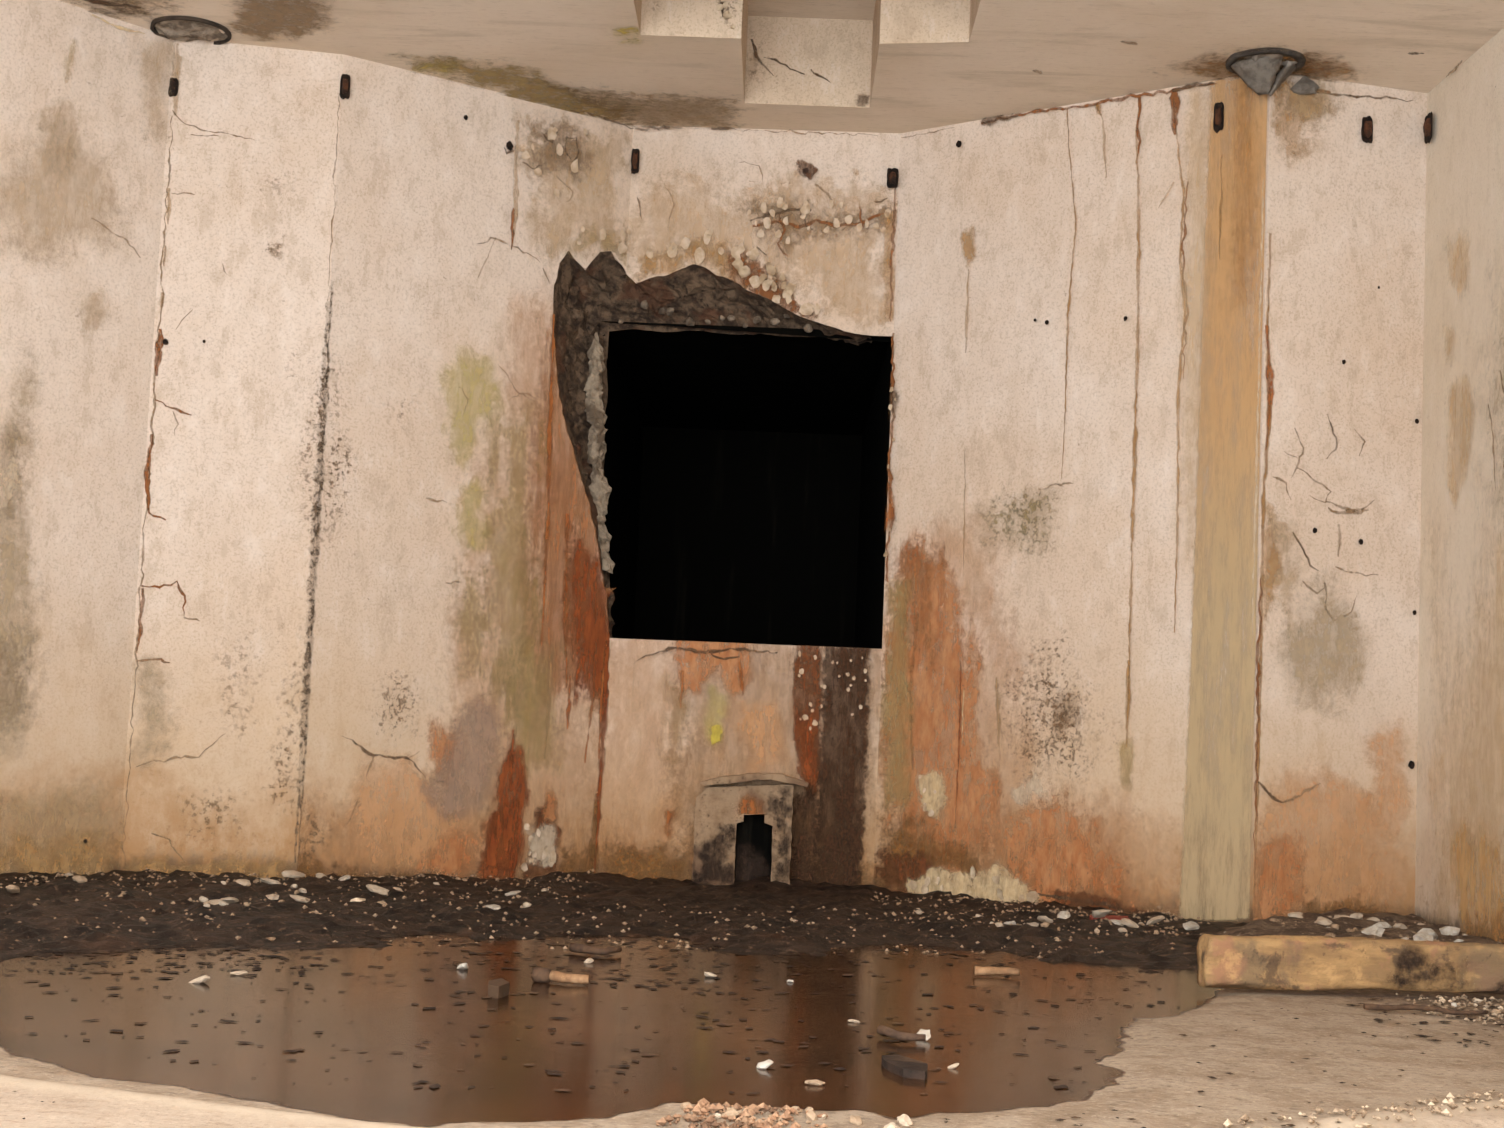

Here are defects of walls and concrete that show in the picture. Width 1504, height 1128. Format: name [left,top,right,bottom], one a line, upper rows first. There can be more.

water stain [87,0,170,34]
water stain [230,0,328,41]
crack [91,110,257,870]
water stain [136,194,356,879]
corrosion [477,314,682,879]
spalling [553,226,872,638]
corrosion [675,640,750,737]
flaking render [883,333,897,582]
corrosion [880,537,1135,908]
water stain [1006,640,1085,773]
water stain [1120,293,1139,783]
water stain [1161,50,1406,921]